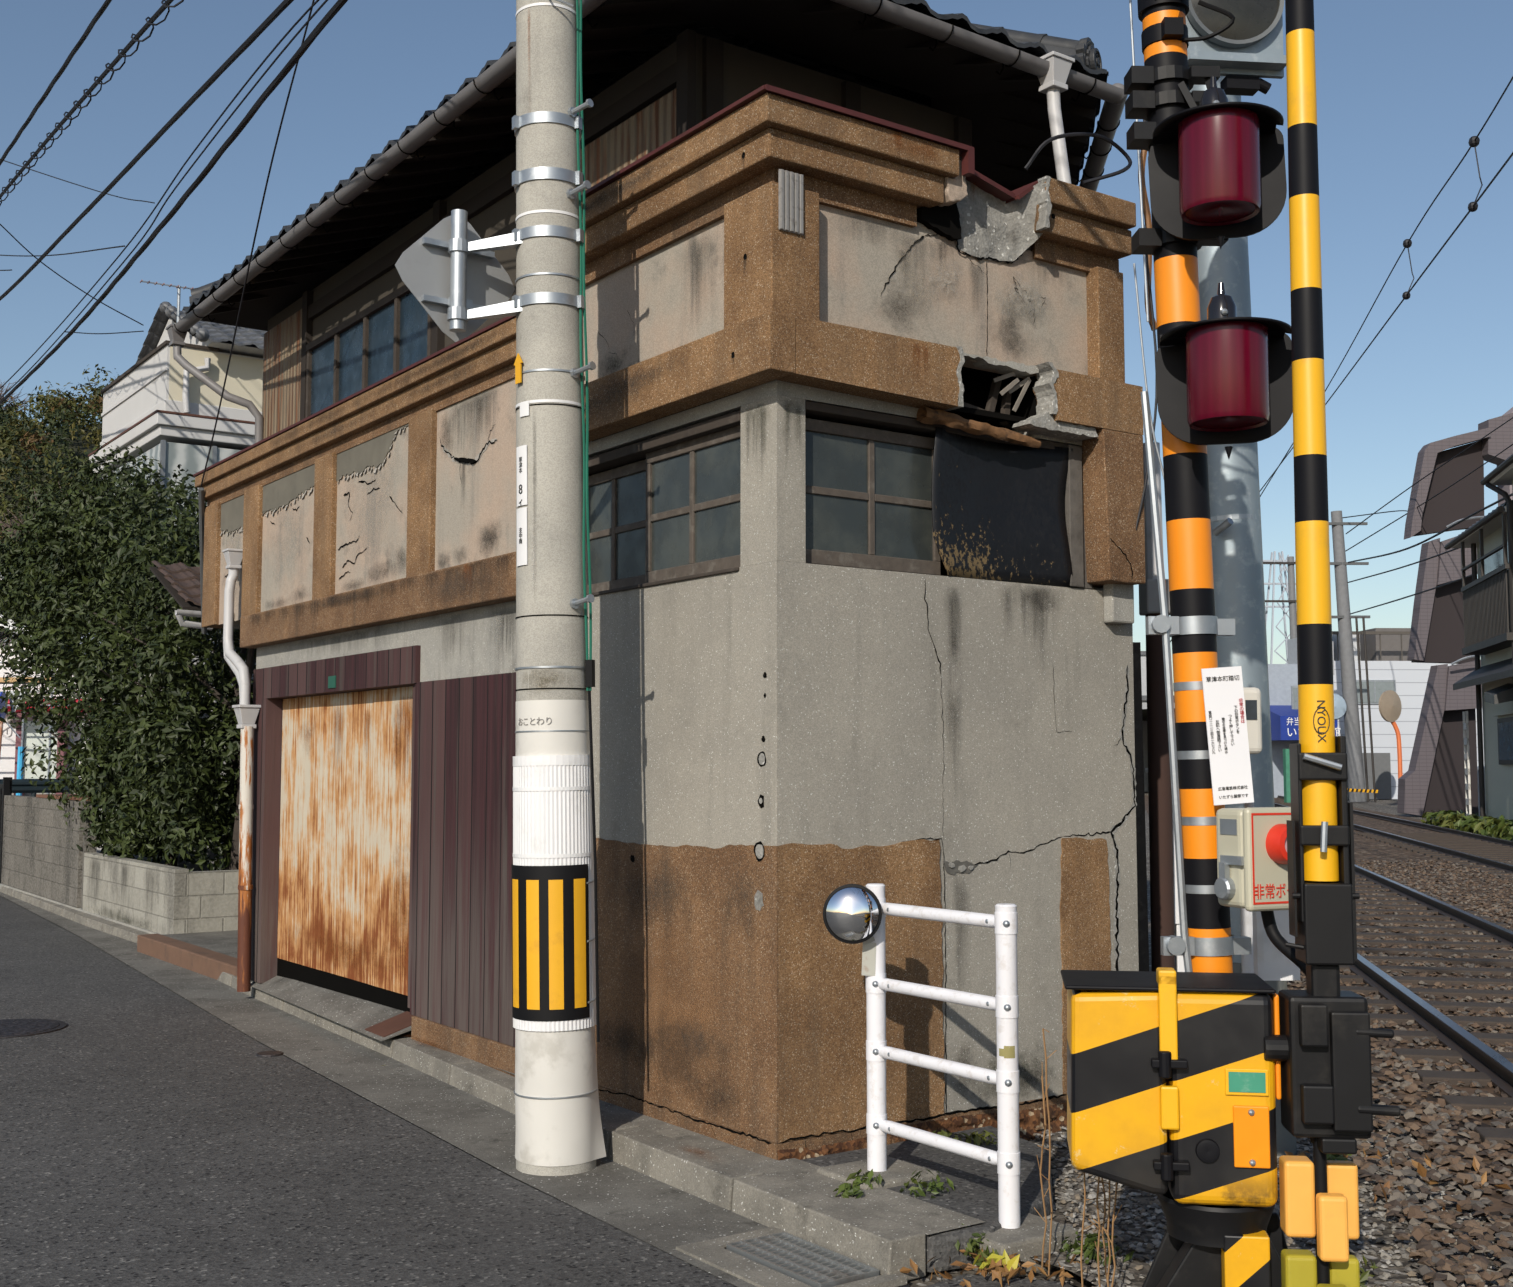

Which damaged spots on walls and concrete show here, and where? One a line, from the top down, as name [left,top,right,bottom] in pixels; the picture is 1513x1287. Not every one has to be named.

spalling [917,160,1055,261]
crack [881,234,1023,353]
peeling [220,495,244,536]
peeling [262,464,315,525]
peeling [336,423,409,521]
crack [598,584,1137,1147]